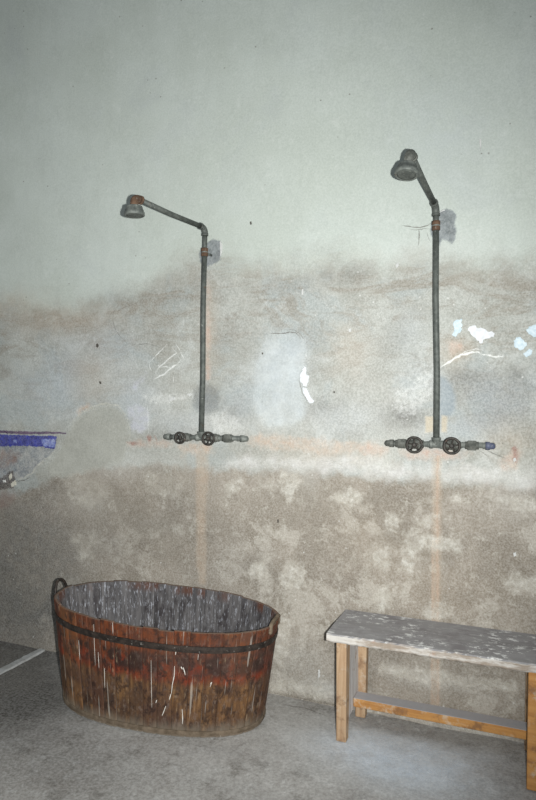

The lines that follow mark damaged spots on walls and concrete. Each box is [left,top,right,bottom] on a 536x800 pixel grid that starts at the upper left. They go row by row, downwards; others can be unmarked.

crack [444,349,499,365]
peeling [452,319,495,344]
peeling [514,325,536,357]
peeling [300,366,314,404]
flaking render [0,453,17,490]